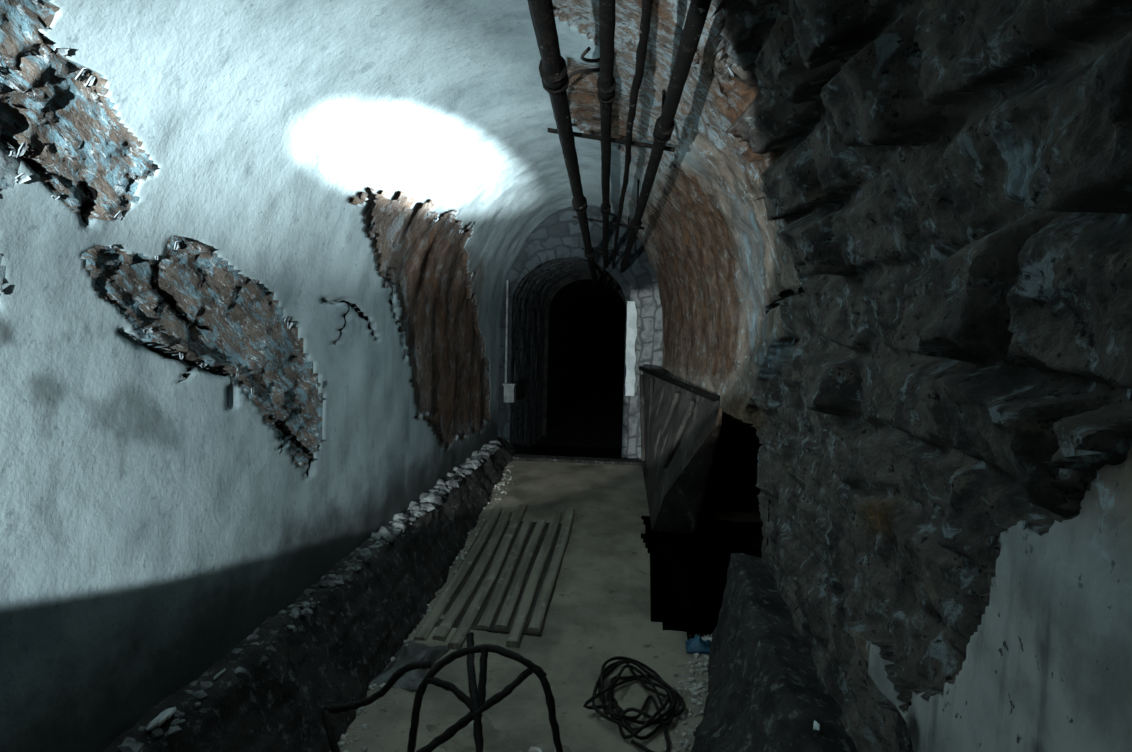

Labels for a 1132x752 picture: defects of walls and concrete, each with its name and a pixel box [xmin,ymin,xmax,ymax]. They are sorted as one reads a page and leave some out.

spalling [0,0,158,221]
spalling [552,0,600,46]
spalling [81,236,323,468]
spalling [348,187,491,451]
flaking render [566,0,1132,752]